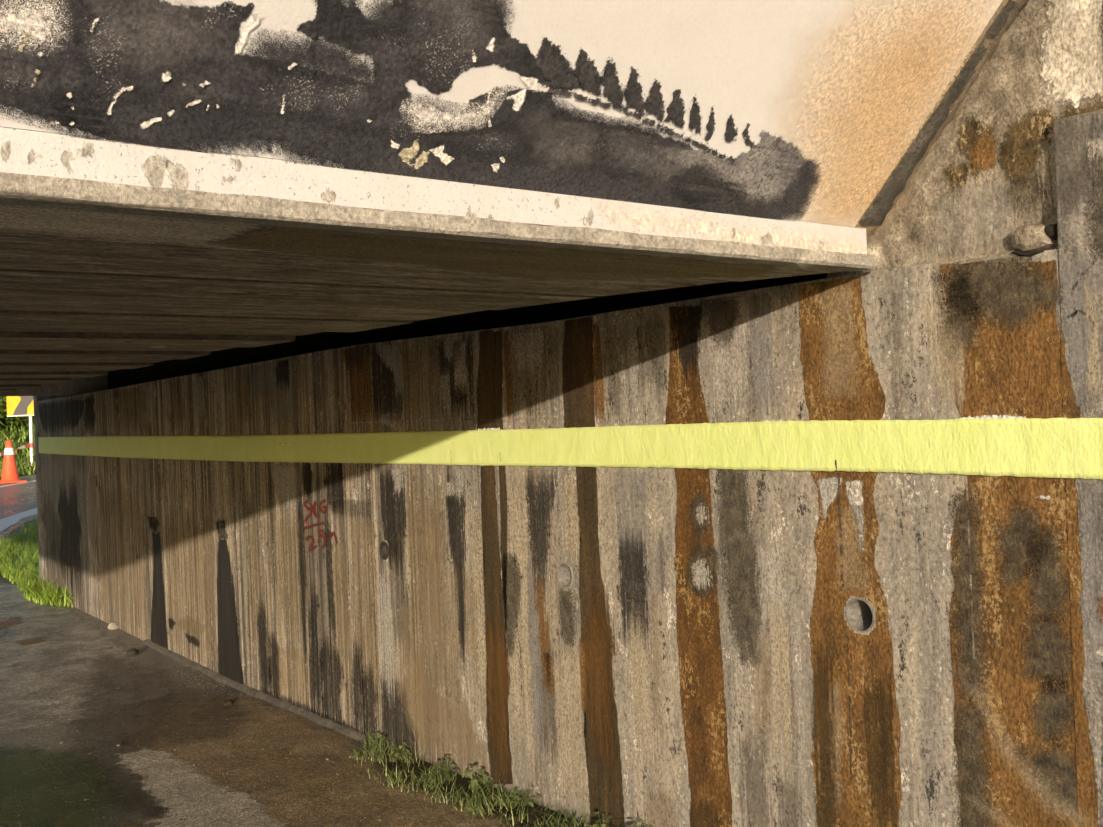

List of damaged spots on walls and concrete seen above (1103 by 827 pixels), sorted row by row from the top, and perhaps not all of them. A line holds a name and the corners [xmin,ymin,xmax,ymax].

peeling [107,86,133,115]
peeling [141,155,200,189]
peeling [141,100,220,129]
peeling [391,139,454,169]
damp [437,326,548,430]
damp [562,317,595,428]
corrosion [932,256,1081,419]
damp [147,515,168,649]
damp [445,465,661,827]
corrosion [675,468,732,827]
corrosion [810,471,902,827]
corrosion [946,475,1103,827]